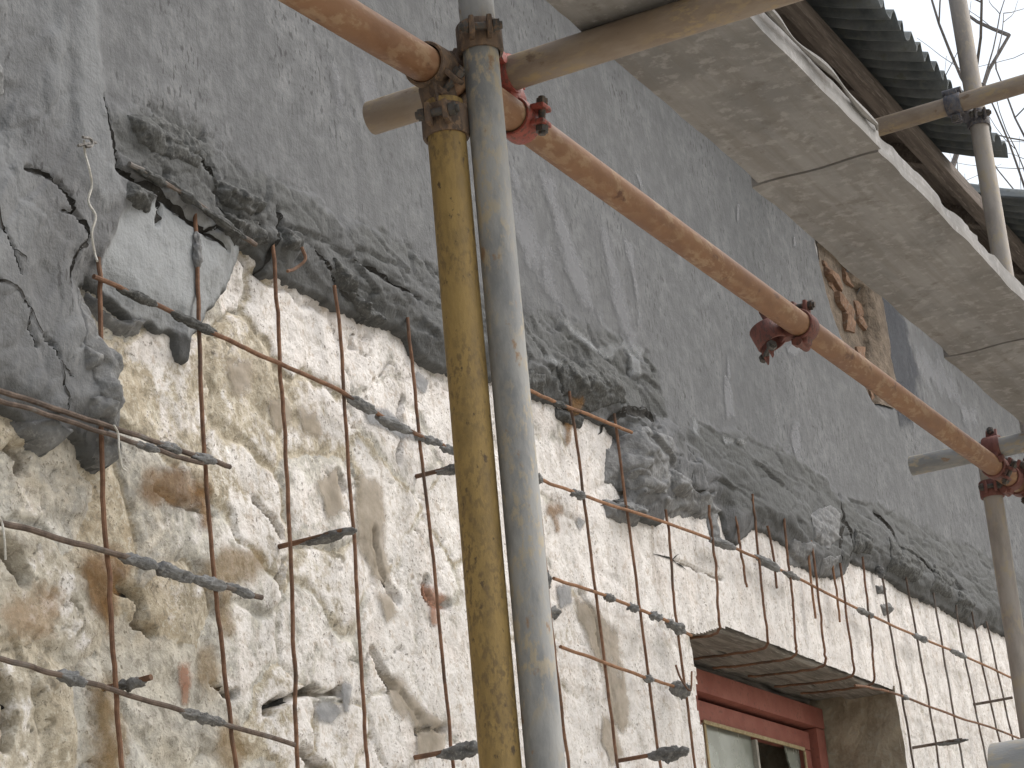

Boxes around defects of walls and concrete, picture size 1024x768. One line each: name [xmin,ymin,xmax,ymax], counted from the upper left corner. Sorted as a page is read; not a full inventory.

crack [0,209,74,410]
crack [24,168,90,283]
crack [103,97,227,250]
crack [315,250,418,302]
spalling [817,243,896,381]
corrosion [84,556,128,619]
corrosion [143,469,210,526]
peeling [317,470,398,622]
corrosion [420,585,446,625]
corrosion [180,665,191,704]
peeling [379,671,445,754]
peeling [577,599,629,763]